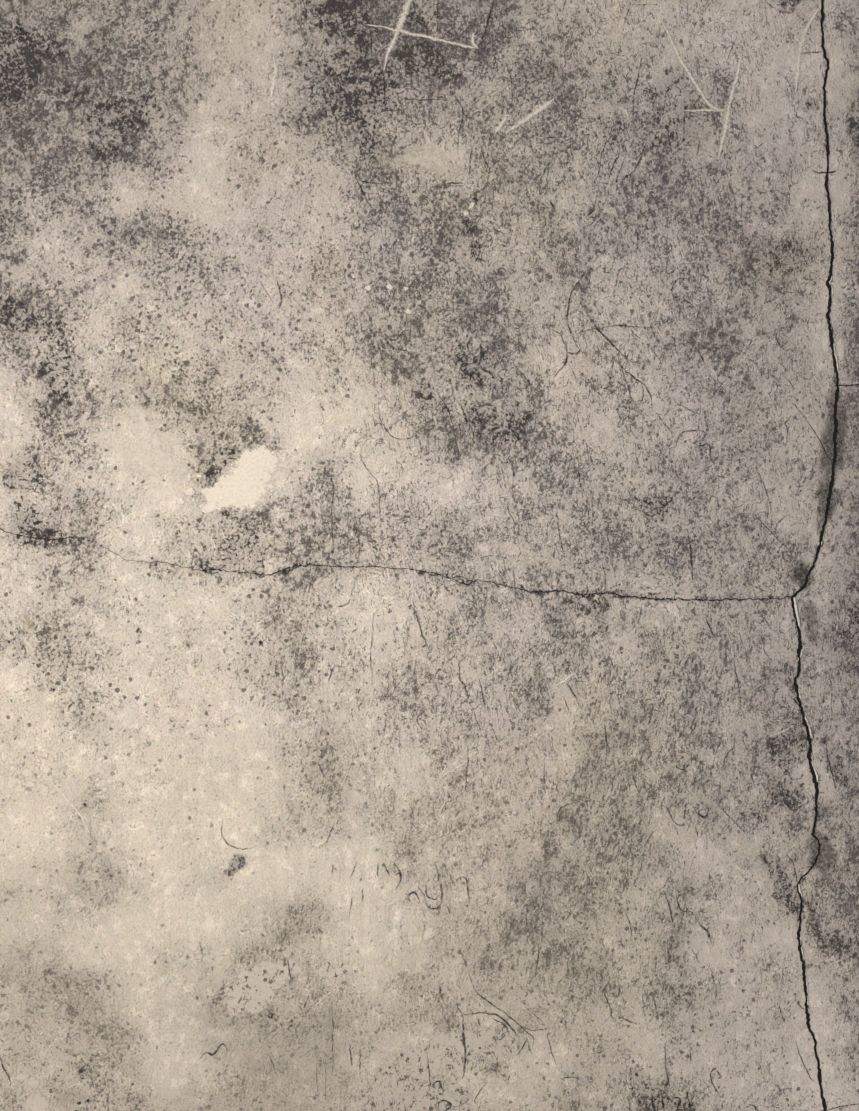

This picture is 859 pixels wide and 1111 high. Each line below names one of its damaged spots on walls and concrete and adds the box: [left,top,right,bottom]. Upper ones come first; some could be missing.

crack [18,535,179,566]
crack [187,0,859,1111]